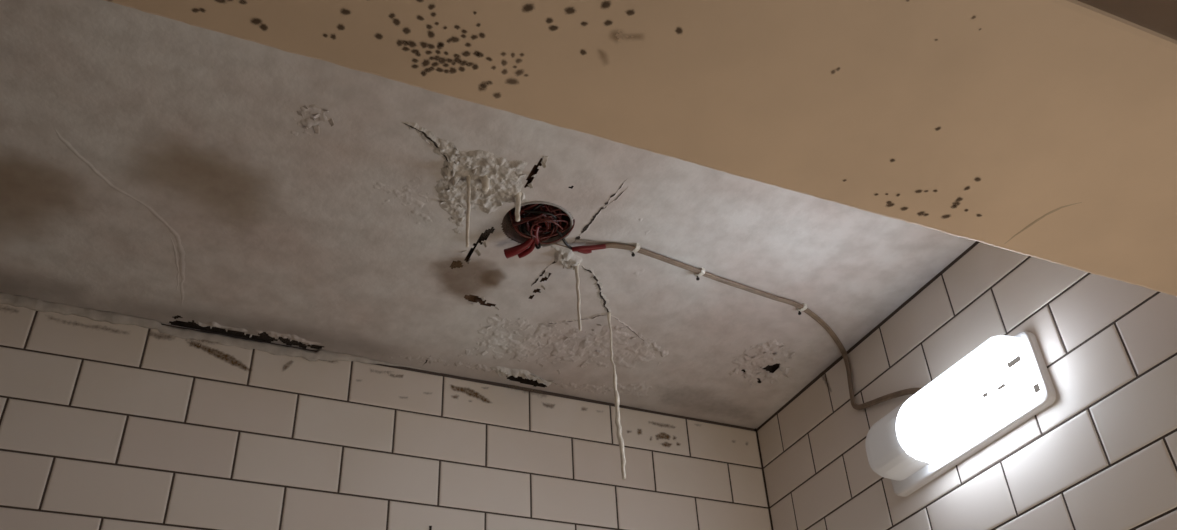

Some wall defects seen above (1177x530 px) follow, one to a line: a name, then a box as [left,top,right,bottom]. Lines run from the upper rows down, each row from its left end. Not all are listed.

water stain [389,0,528,98]
peeling [433,137,548,269]
crack [169,315,324,349]
spalling [464,295,500,310]
peeling [490,366,559,388]
crack [531,179,647,343]